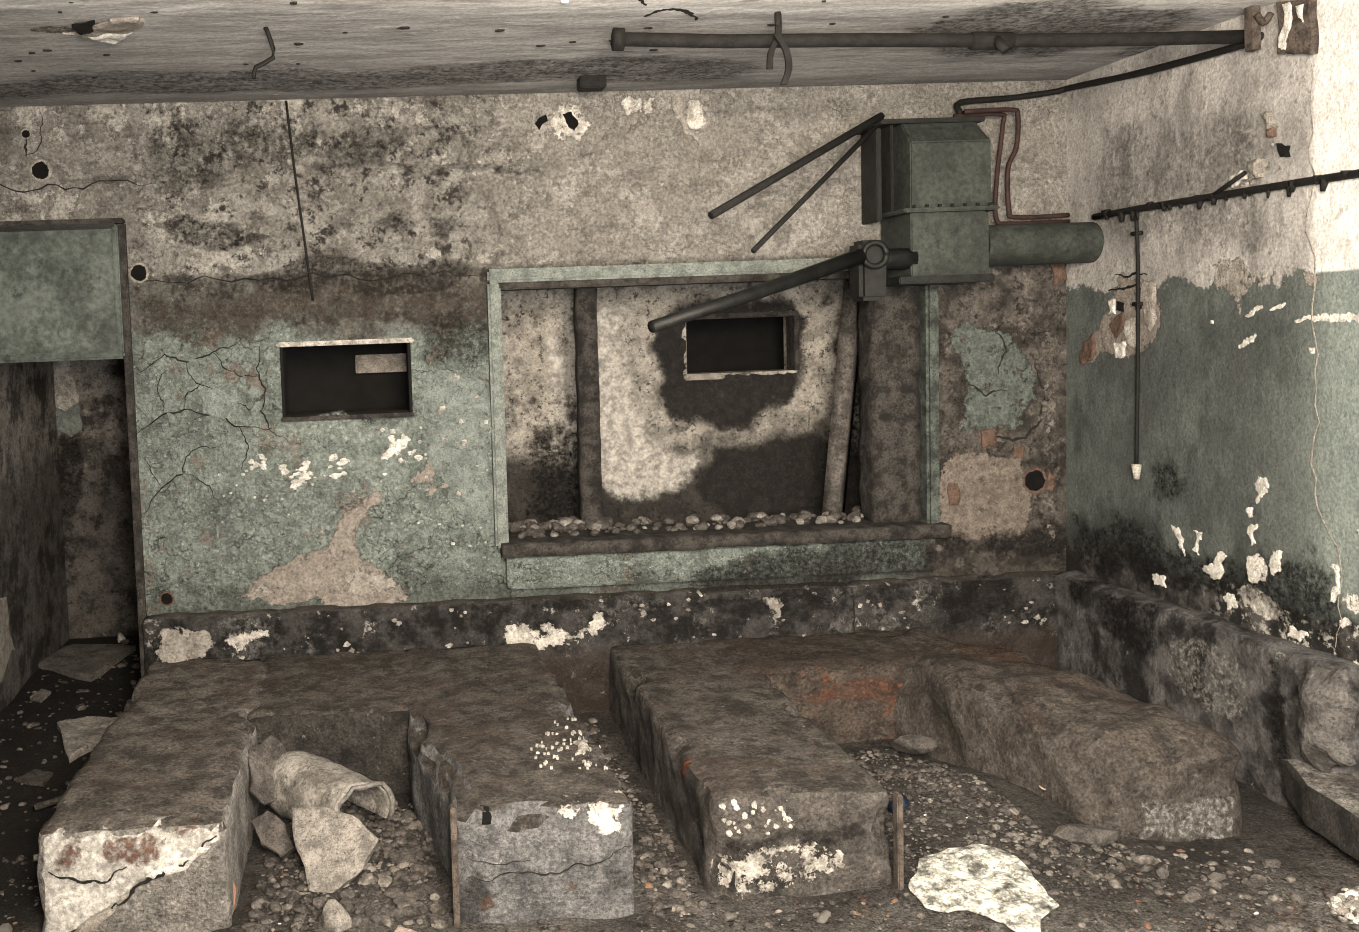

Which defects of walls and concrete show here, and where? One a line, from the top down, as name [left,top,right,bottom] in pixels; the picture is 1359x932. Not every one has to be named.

damp [148,256,487,347]
crack [137,338,290,514]
flaking render [223,413,449,626]
damp [698,432,828,520]
damp [845,375,860,508]
flaking render [940,378,1064,550]
peeling [1171,525,1227,580]
damp [1069,512,1341,654]
peeling [1223,476,1309,642]
corrosion [57,840,81,871]
corrosion [103,832,160,866]
crack [49,835,217,932]